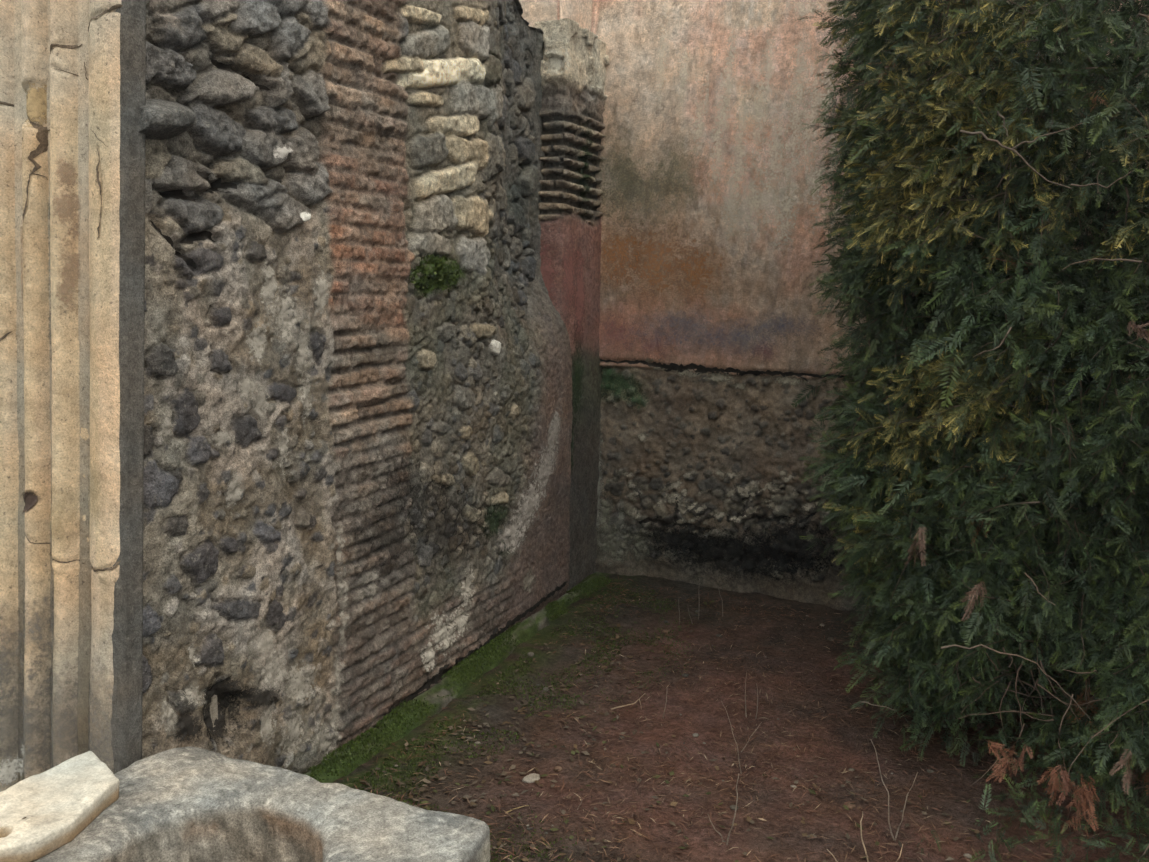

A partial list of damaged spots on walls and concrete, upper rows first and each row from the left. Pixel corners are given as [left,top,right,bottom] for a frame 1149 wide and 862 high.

crack [0,101,50,220]
crack [92,131,106,238]
peeling [645,358,746,389]
crack [600,359,844,382]
peeling [657,470,818,524]
damp [420,562,476,672]